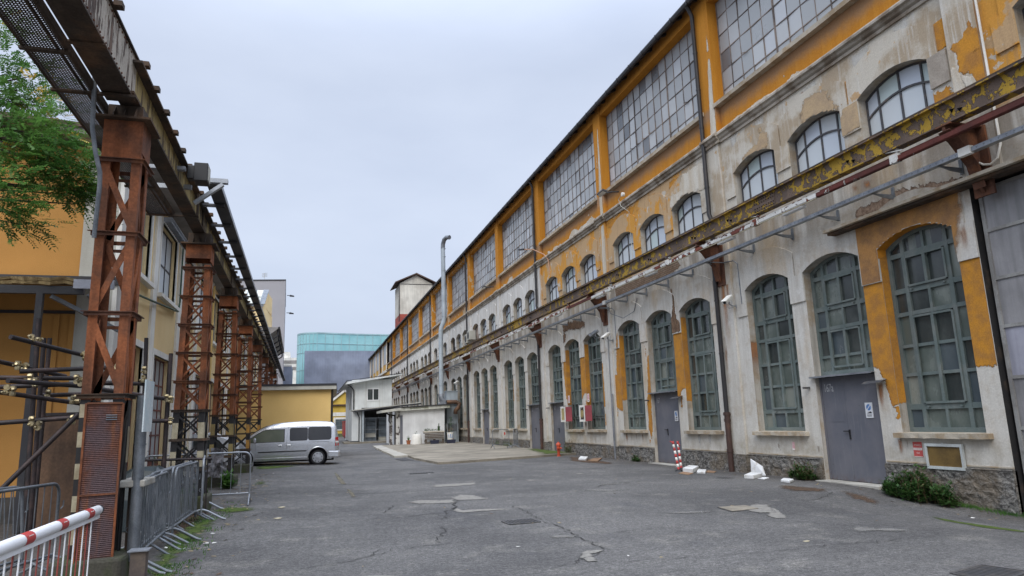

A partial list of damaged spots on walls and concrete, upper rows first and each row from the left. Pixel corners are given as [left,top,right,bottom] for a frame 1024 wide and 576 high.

peeling [933,18,985,103]
peeling [863,223,937,419]
peeling [960,257,997,368]